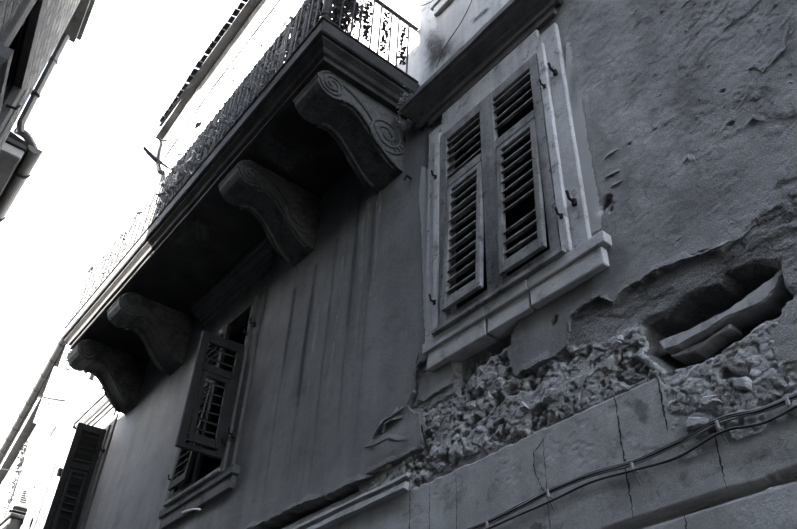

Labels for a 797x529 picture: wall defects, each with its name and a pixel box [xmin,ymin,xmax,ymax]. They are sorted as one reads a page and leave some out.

peeling [565,41,604,234]
spalling [245,164,797,529]